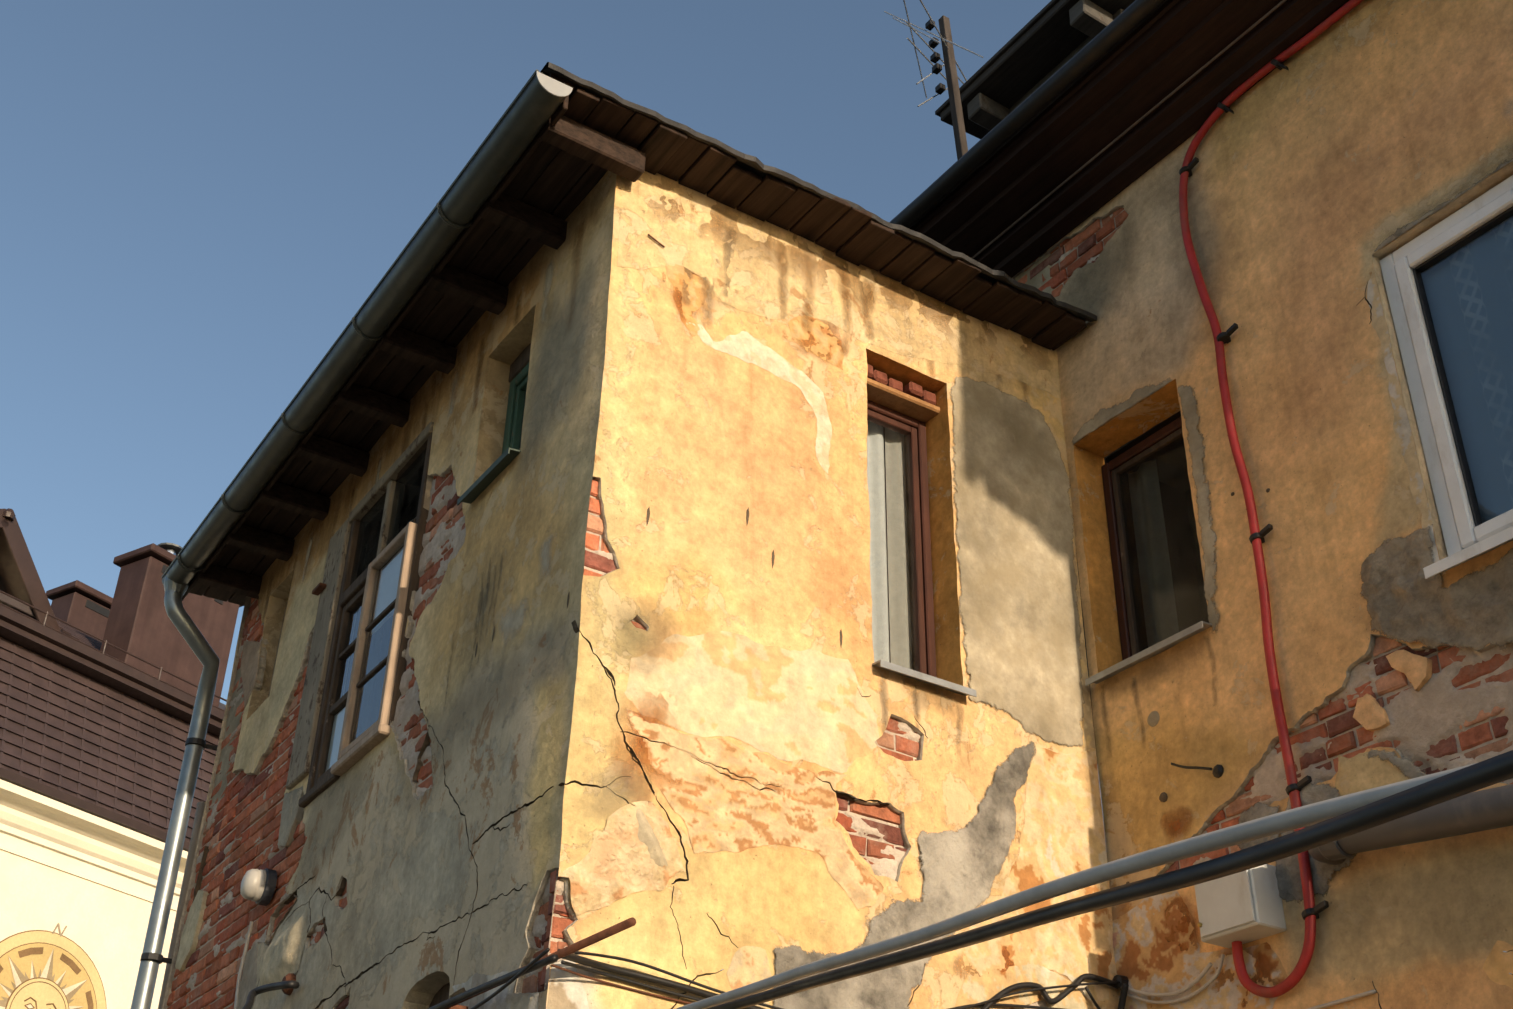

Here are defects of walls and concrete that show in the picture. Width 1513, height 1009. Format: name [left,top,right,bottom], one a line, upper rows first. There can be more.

peeling [617,171,1061,474]
spalling [1012,205,1129,297]
spalling [162,595,315,1009]
spalling [390,464,466,801]
crack [284,620,738,1009]
spalling [450,867,589,1009]
spalling [579,477,620,577]
crack [695,758,779,791]
peeling [624,630,924,909]
crack [819,779,889,806]
peeling [955,538,1288,1009]
spalling [1191,634,1513,838]